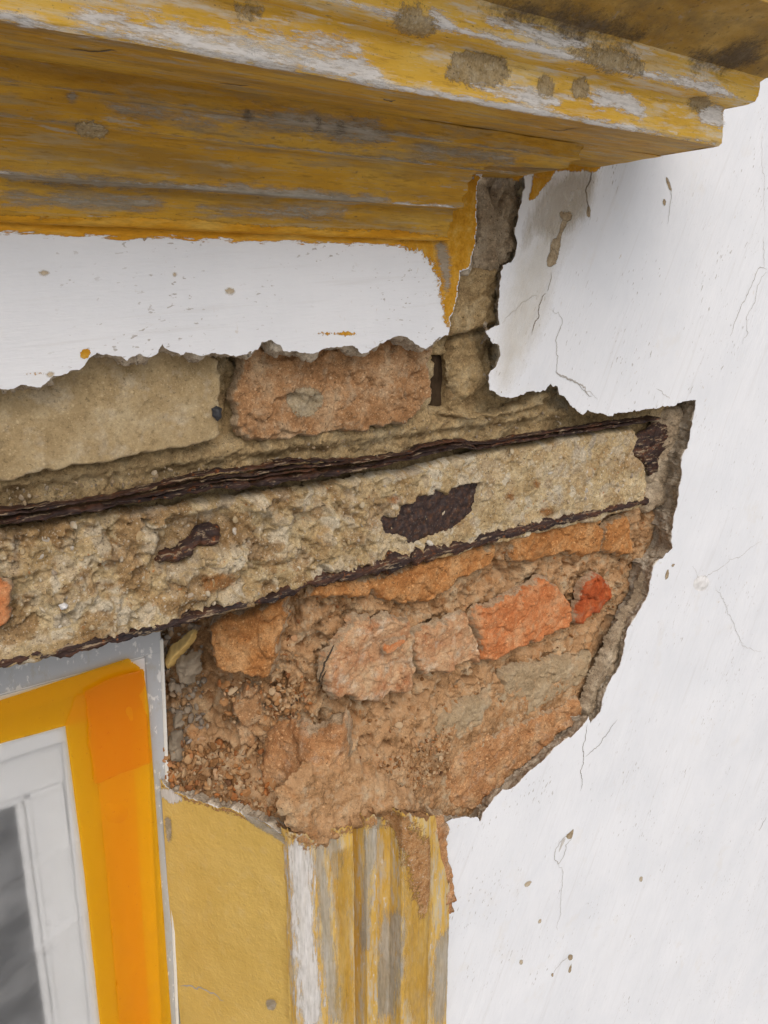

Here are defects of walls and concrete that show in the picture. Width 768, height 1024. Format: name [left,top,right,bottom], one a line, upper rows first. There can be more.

peeling [70,0,384,89]
peeling [571,76,647,118]
crack [584,172,592,217]
flaking render [0,172,572,420]
crack [507,275,598,400]
rust [154,522,221,563]
rust [202,574,235,593]
rust [0,419,669,516]
rust [380,483,477,543]
spalling [421,400,696,914]
peeling [160,778,449,1024]
crack [554,830,574,930]